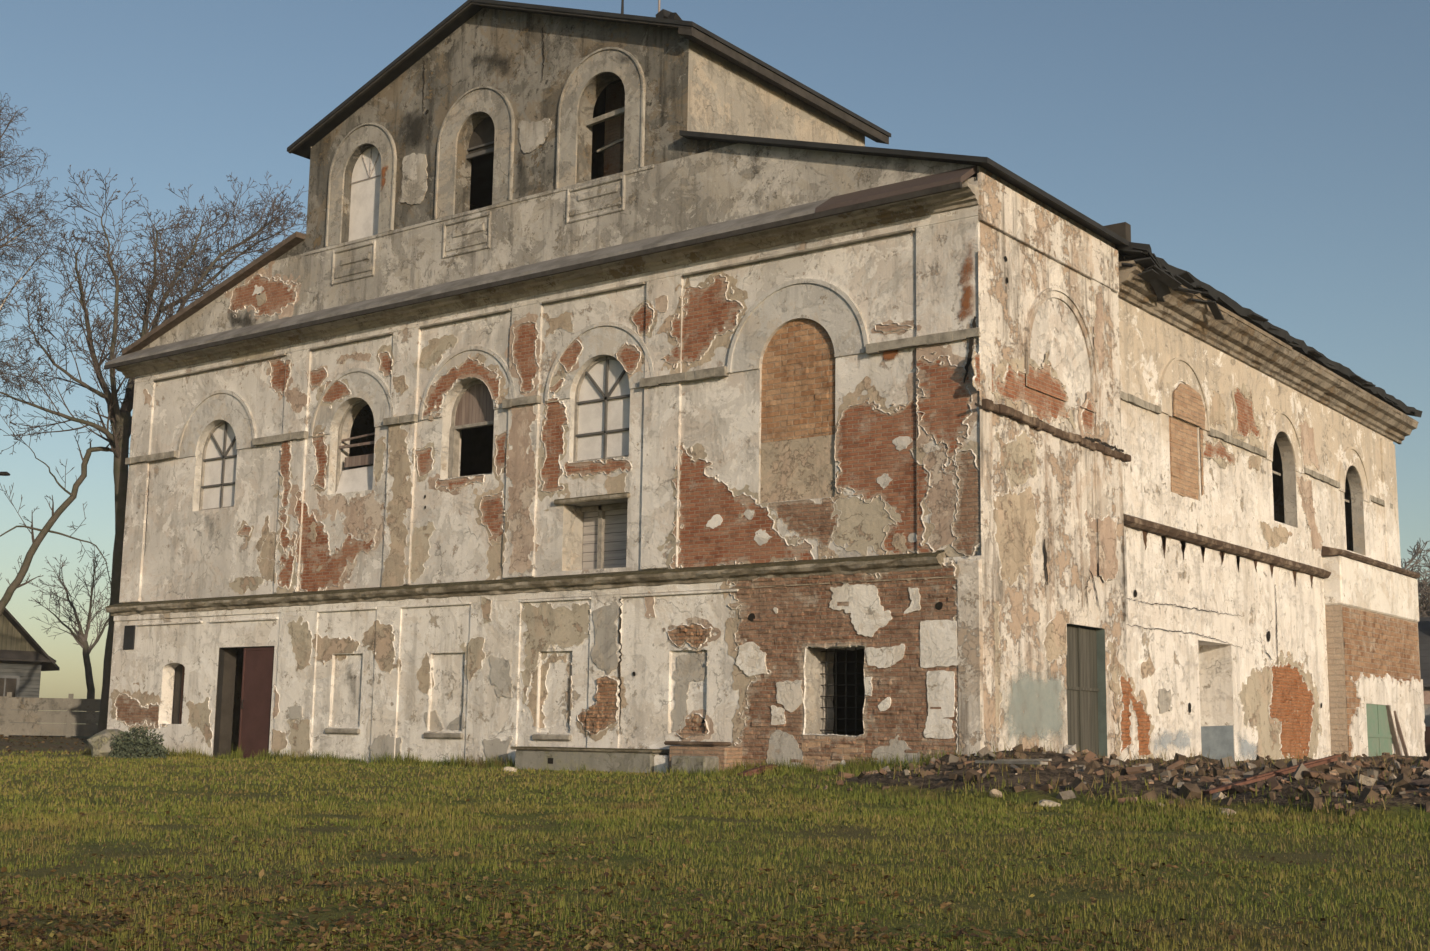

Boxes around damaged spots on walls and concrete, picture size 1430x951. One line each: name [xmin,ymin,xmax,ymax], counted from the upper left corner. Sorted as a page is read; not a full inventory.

flaking render [224,260,302,321]
flaking render [614,270,750,379]
flaking render [228,311,633,682]
flaking render [644,320,1098,772]
flaking render [110,682,167,734]
peeling [186,697,213,748]
peeling [287,615,435,695]
peeling [517,599,636,742]
spalling [1106,637,1155,761]
peeling [1237,631,1322,760]